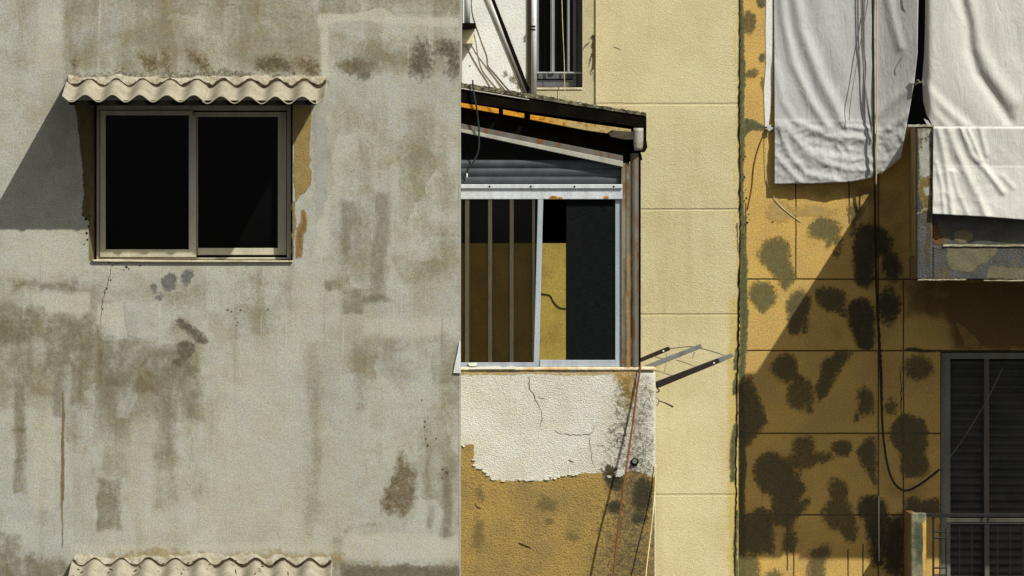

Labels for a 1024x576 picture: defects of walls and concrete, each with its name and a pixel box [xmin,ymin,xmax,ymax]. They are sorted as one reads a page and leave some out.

damp [66,49,320,81]
flaking render [293,105,312,202]
peeling [918,127,932,212]
damp [729,0,941,576]
peeling [986,265,1024,280]
crack [529,380,603,467]
damp [380,454,416,516]
peeling [461,444,655,576]
damp [599,381,655,576]